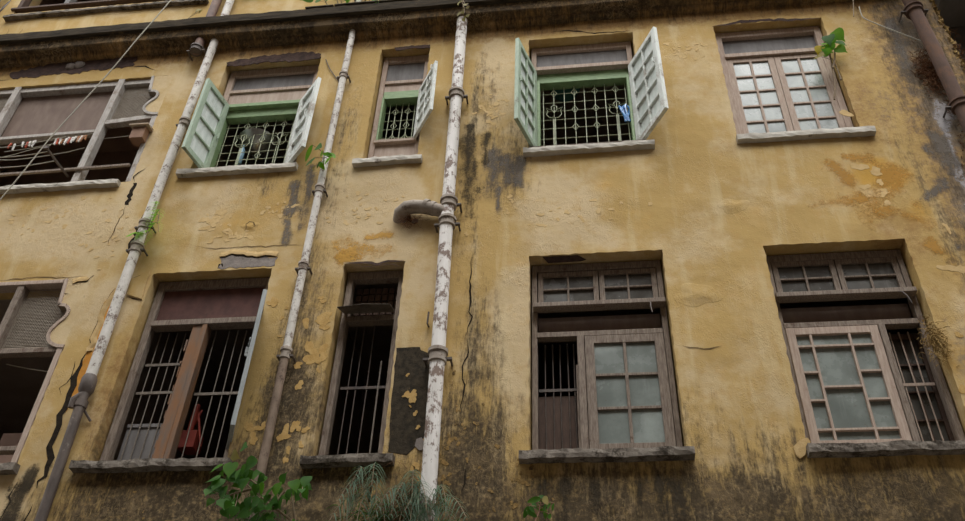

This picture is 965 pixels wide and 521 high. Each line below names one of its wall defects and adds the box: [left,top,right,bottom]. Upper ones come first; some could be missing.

damp [458,124,526,218]
peeling [850,163,891,206]
spalling [218,255,278,270]
crack [460,257,473,413]
peeling [402,389,424,440]
damp [636,471,689,521]